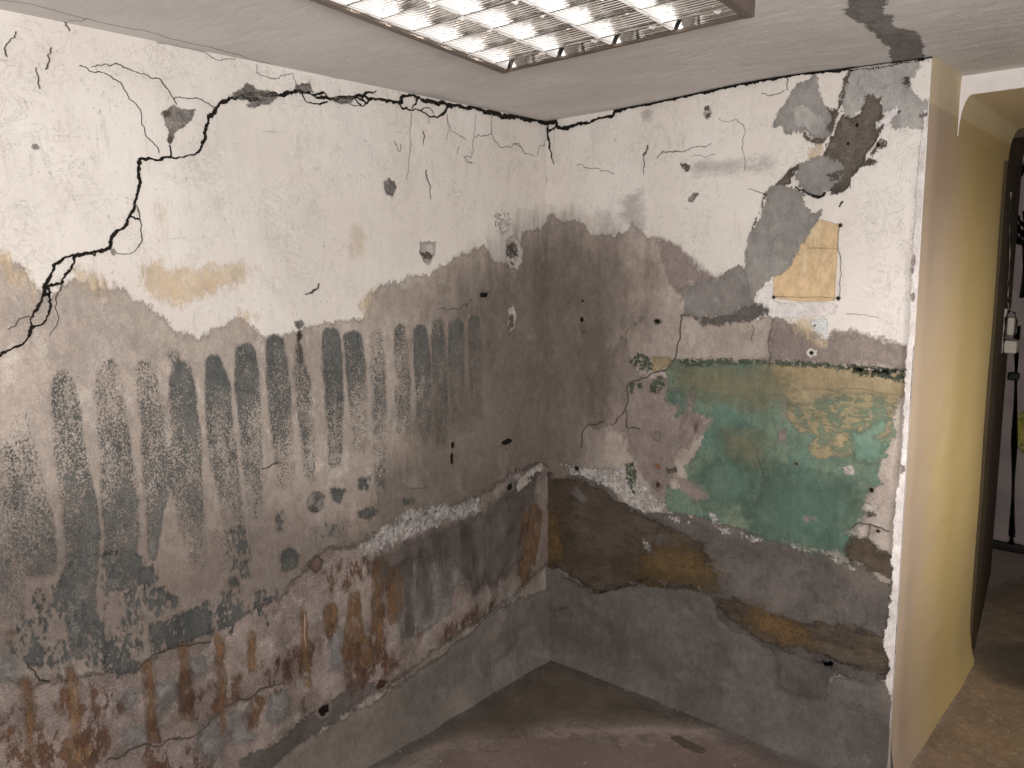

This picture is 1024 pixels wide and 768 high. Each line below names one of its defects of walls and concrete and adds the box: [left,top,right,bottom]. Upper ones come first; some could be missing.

flaking render [382,178,397,196]
flaking render [419,241,436,265]
crack [0,0,933,357]
flaking render [494,211,523,271]
crack [580,314,688,448]
peeling [565,57,931,728]
flaking render [0,315,556,768]
leakage [0,213,914,768]
rust [0,666,124,768]
rust [143,661,209,768]
rust [178,611,315,729]
rust [324,556,402,697]